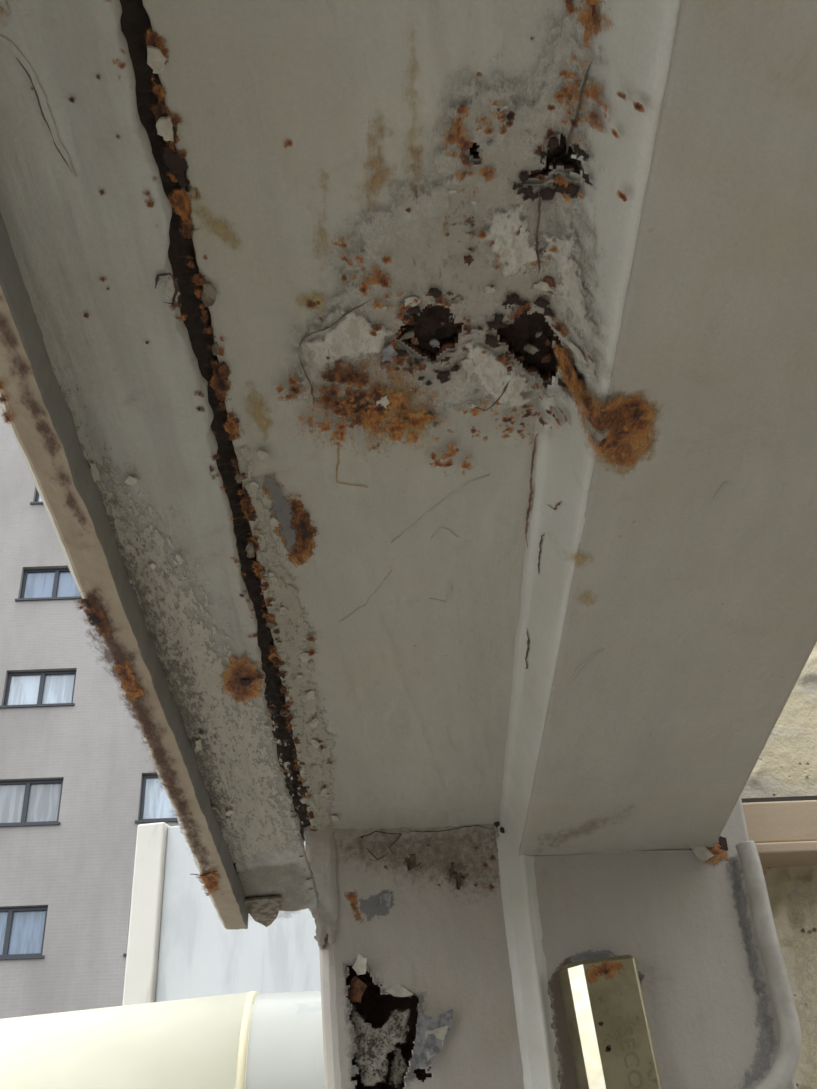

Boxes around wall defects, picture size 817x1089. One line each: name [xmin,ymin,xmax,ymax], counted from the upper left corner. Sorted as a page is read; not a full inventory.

rust [565,0,611,49]
crack [15,56,73,174]
rust [146,30,235,247]
spalling [617,92,644,112]
spalling [276,0,619,488]
rust [0,382,13,424]
rust [187,255,240,440]
rust [553,344,657,474]
crack [525,434,561,575]
rust [209,454,317,836]
crack [523,631,531,669]
rust [77,589,220,896]